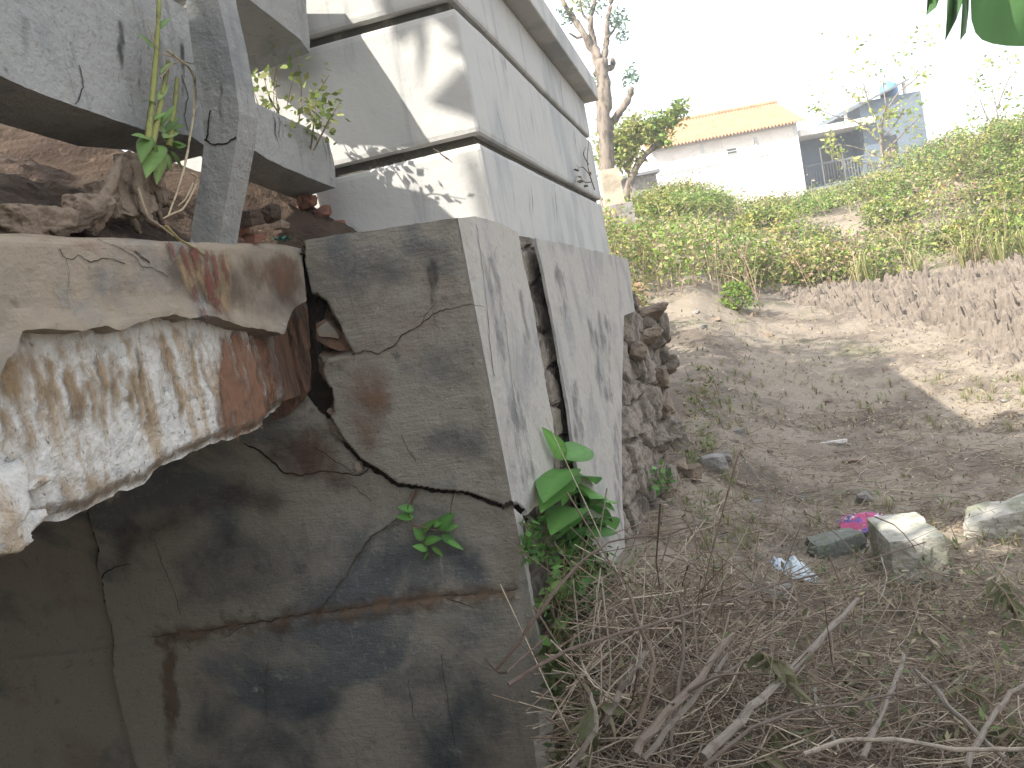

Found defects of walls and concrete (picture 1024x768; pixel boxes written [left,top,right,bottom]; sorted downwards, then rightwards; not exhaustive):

crack [181,75,236,146]
crack [60,238,168,300]
crack [302,246,335,419]
spalling [313,293,352,442]
crack [353,225,519,430]
spalling [40,393,286,512]
crack [243,435,528,525]
rust [155,518,516,729]